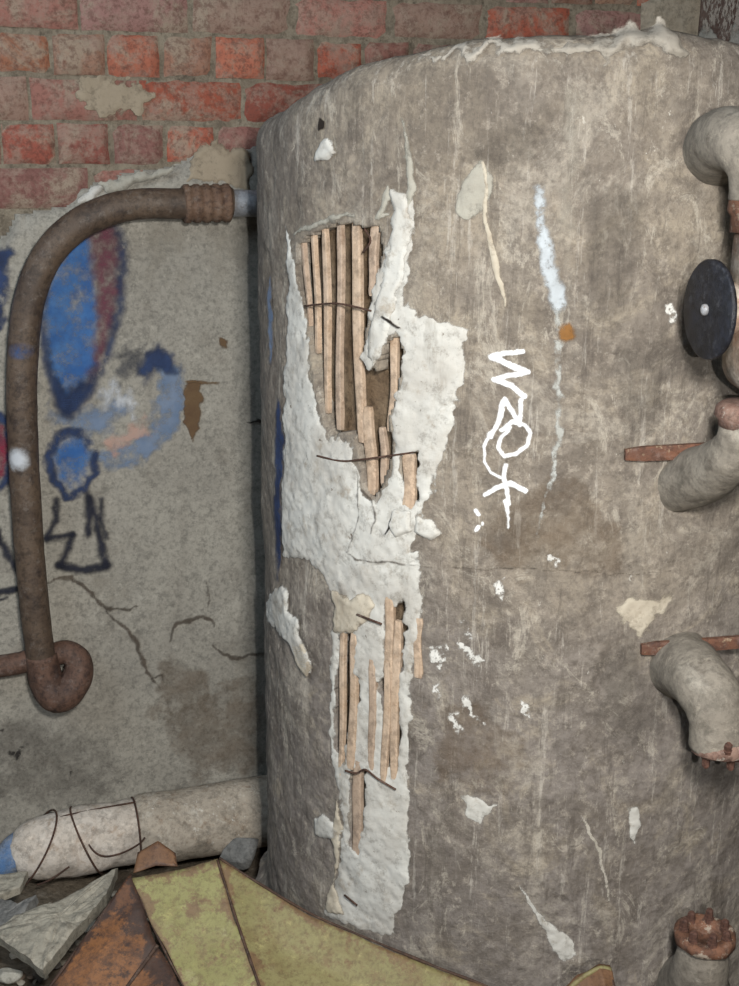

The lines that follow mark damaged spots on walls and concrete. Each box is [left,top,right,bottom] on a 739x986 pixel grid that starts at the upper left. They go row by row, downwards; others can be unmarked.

peeling [698,0,739,42]
peeling [75,75,156,118]
peeling [77,164,178,204]
peeling [186,139,254,190]
peeling [455,161,506,307]
peeling [281,118,468,936]
crack [47,575,163,683]
crack [171,603,213,639]
peeling [266,586,312,677]
peeling [616,595,672,637]
crack [220,651,265,660]
peeling [462,795,497,824]